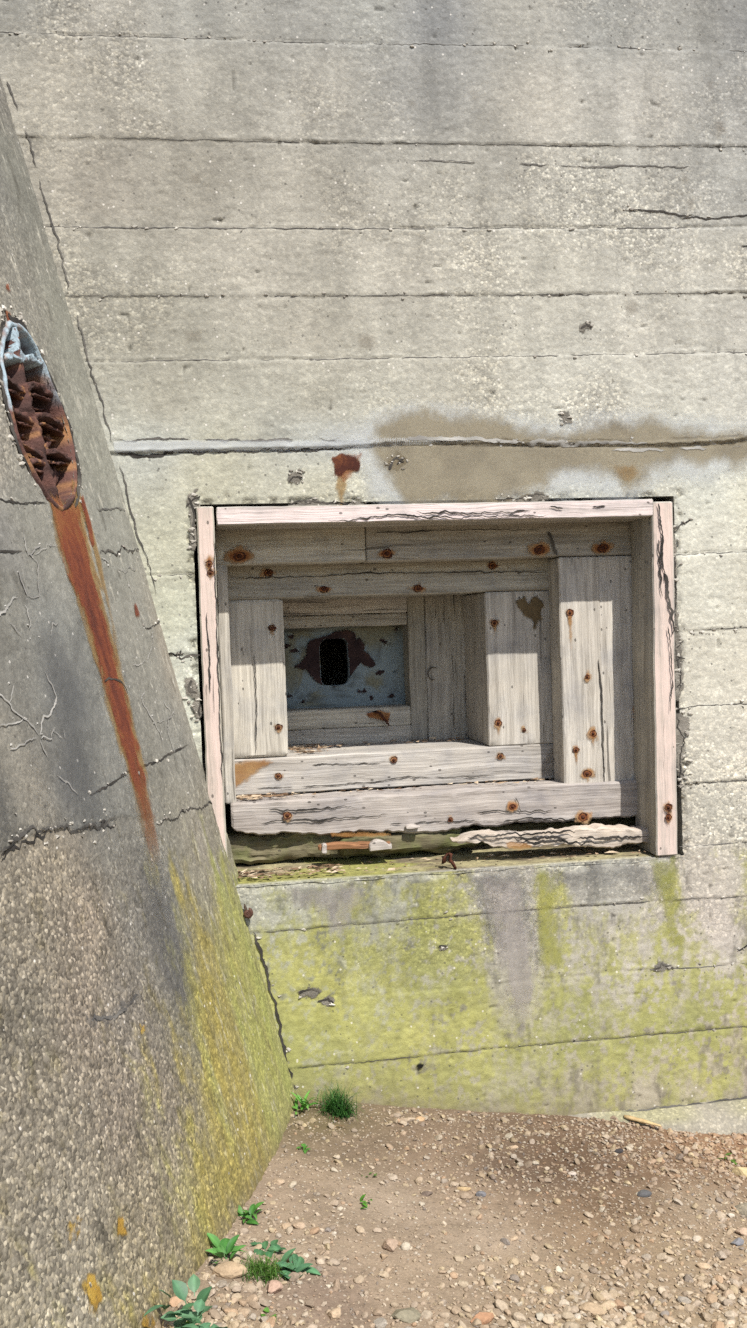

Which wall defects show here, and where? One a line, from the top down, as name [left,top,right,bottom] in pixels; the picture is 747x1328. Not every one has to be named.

crack [1,31,695,52]
corrosion [332,453,360,505]
crack [0,82,747,824]
water stain [374,409,747,504]
corrosion [50,466,152,824]
water stain [483,873,562,1011]
crack [522,896,744,911]
water stain [653,856,682,944]
crack [253,911,747,1095]